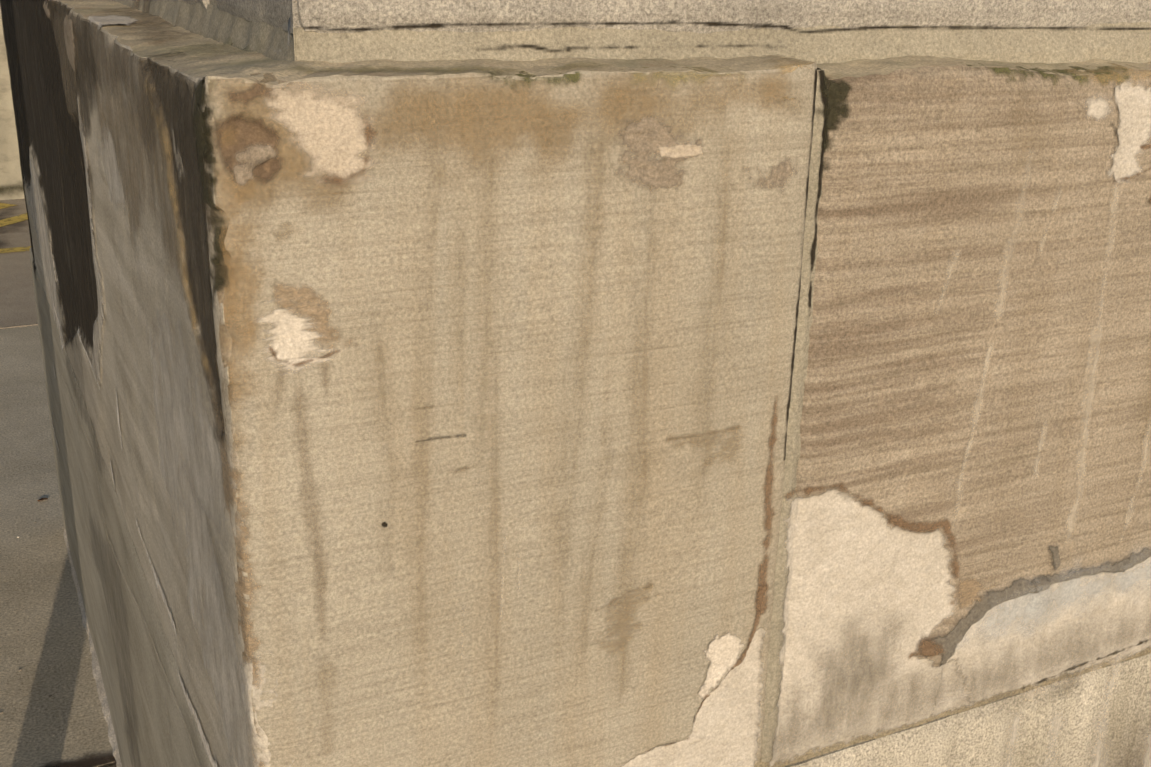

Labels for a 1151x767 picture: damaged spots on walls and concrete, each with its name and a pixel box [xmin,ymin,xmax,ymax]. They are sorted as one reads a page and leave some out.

damp [0,0,199,355]
spalling [216,83,373,185]
damp [274,131,327,177]
peeling [619,117,703,188]
peeling [758,160,792,187]
spalling [1087,82,1151,183]
spalling [258,286,338,370]
peeling [146,52,275,767]
damp [151,320,248,767]
spalling [622,585,767,767]
spalling [770,485,1151,767]